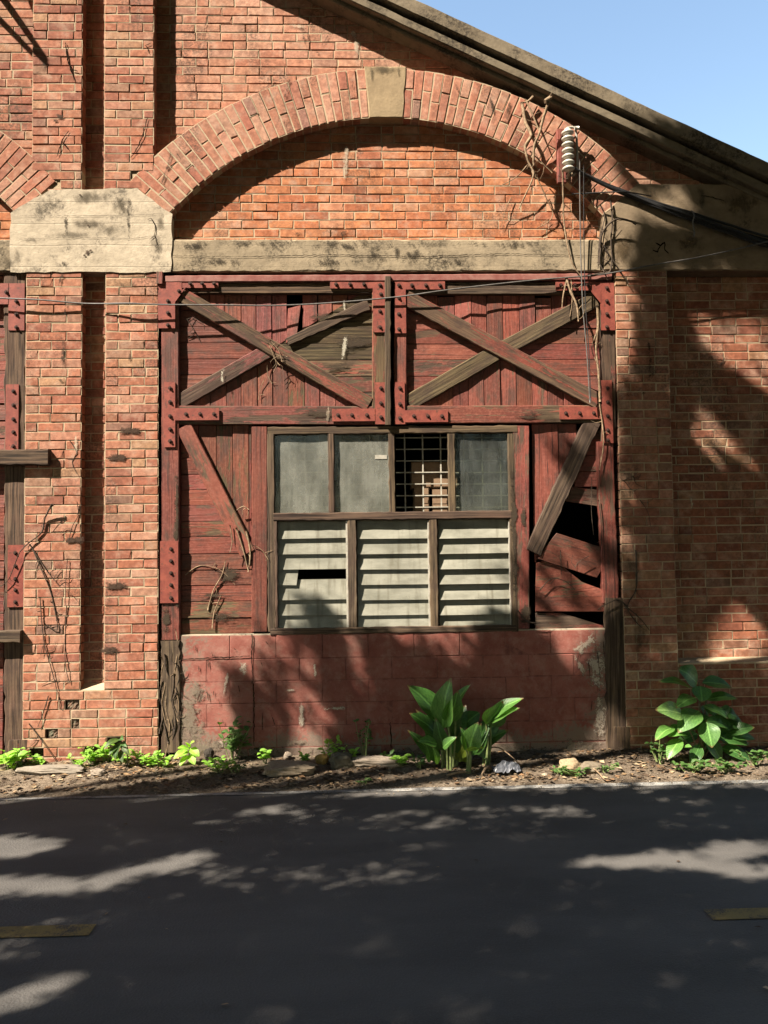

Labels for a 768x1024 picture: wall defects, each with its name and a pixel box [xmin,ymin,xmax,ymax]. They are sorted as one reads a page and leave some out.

leakage [315,231,460,265]
peeling [562,635,606,751]